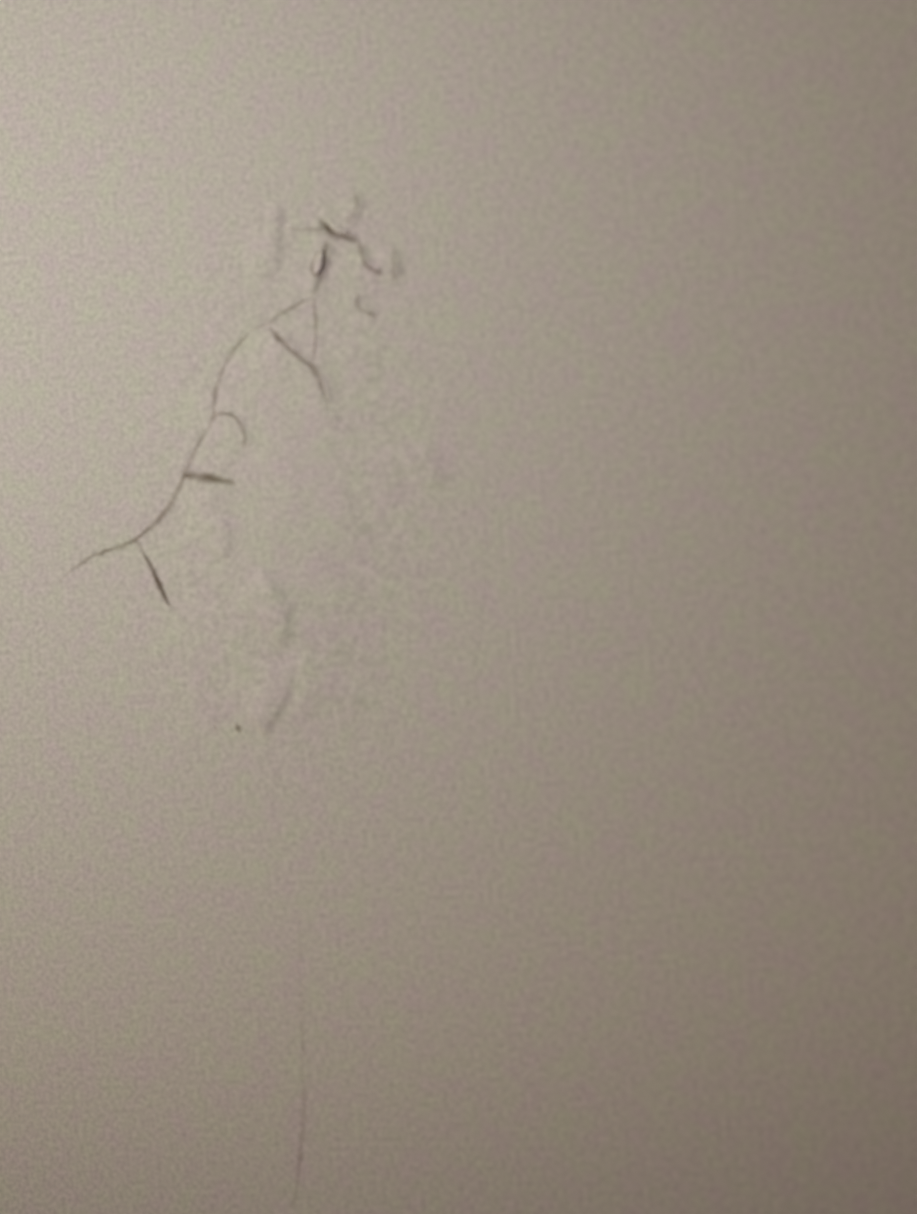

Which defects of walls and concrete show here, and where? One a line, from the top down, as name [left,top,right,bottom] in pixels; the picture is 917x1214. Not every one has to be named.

peeling [282,157,429,325]
crack [154,572,167,600]